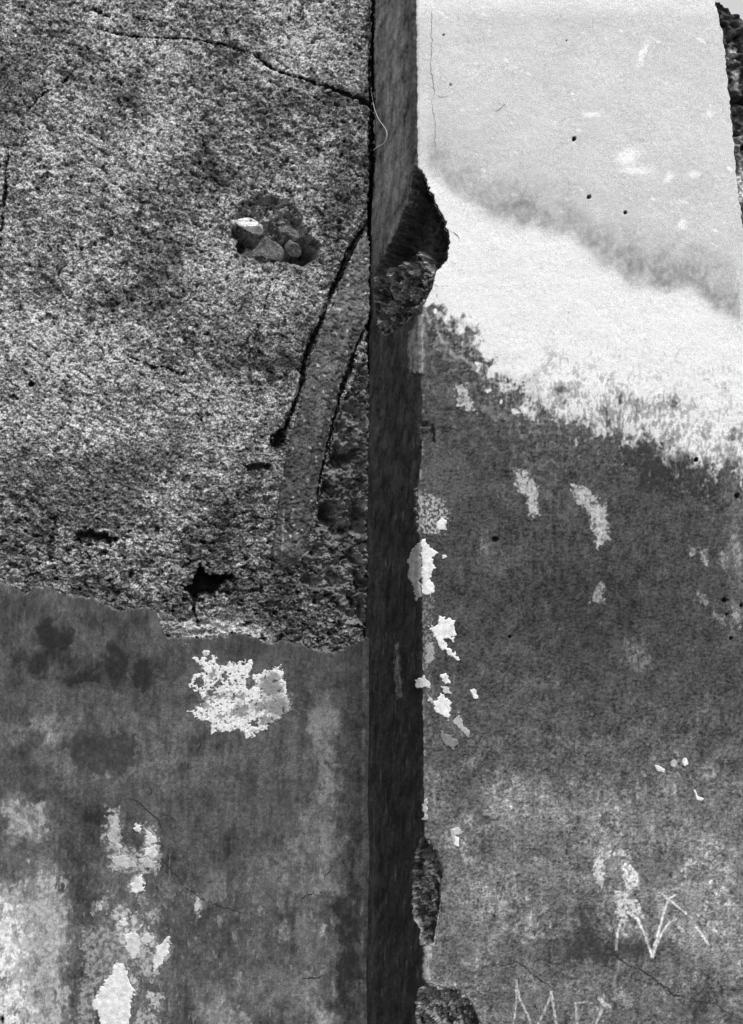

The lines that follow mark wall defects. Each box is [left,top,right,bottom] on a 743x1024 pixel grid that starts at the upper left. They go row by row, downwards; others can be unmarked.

crack [93,0,376,498]
spalling [229,192,323,267]
spalling [372,166,451,373]
leakage [591,239,734,309]
peeling [514,468,541,517]
peeling [570,484,611,549]
peeling [407,421,473,750]
leakage [64,643,158,691]
peeling [186,650,299,739]
peeling [0,799,176,1024]
spalling [411,837,480,1024]